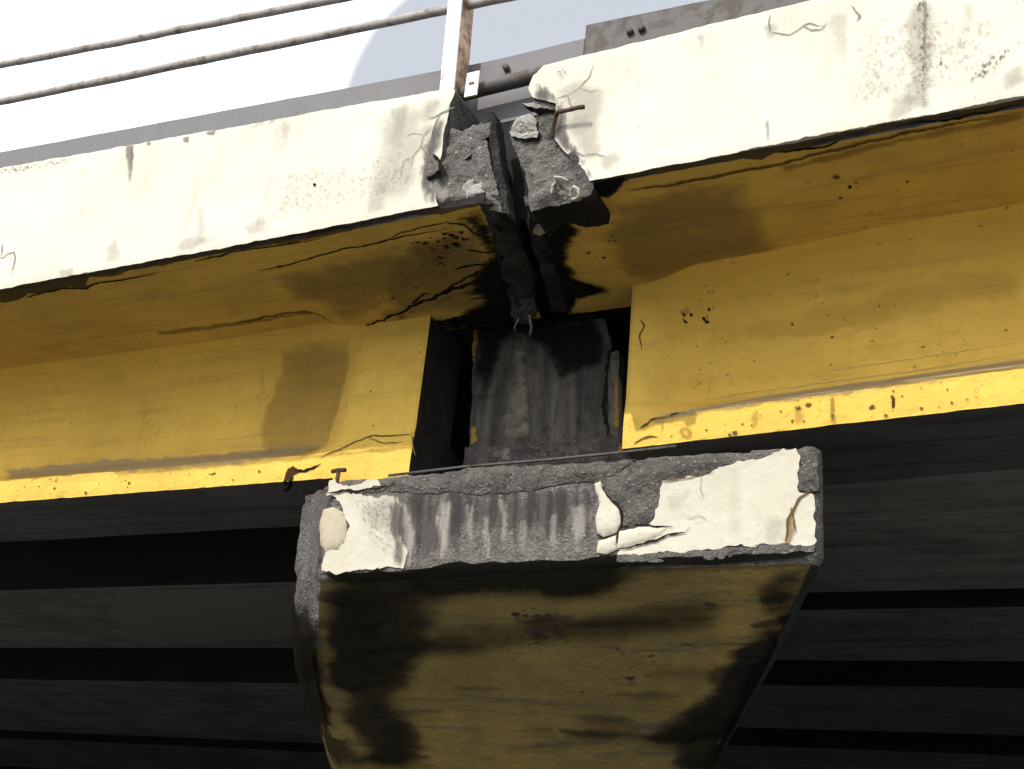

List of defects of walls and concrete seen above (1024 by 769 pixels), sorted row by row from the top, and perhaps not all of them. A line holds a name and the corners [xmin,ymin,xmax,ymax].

crack [768,15,827,35]
leakage [908,0,929,105]
crack [400,107,455,178]
crack [630,112,1023,191]
spalling [0,96,1024,335]
crack [259,220,513,326]
leakage [543,232,599,316]
crack [160,311,333,334]
crack [283,430,417,493]
spalling [796,449,820,493]
spalling [617,543,816,567]
leakage [309,488,809,768]